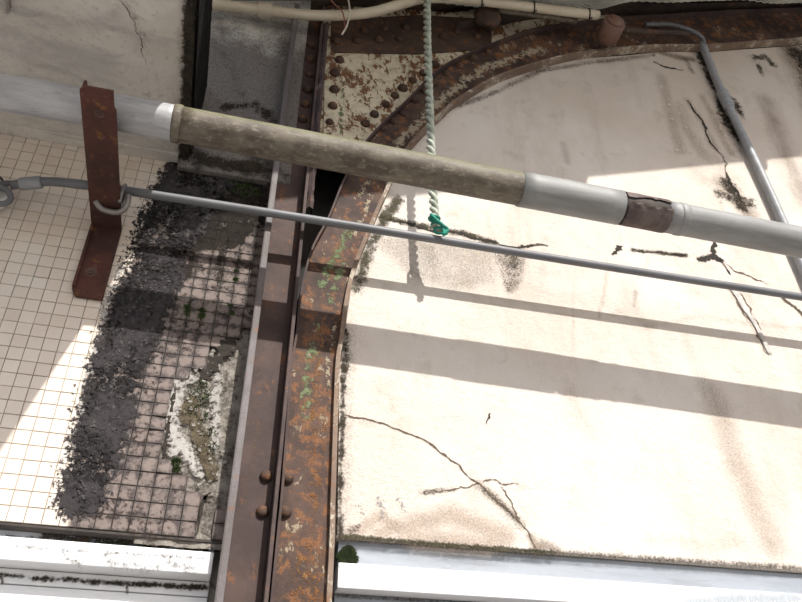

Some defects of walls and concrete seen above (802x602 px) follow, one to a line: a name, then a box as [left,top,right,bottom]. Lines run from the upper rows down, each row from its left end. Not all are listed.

crack [4,0,12,14]
crack [121,1,146,64]
leakage [180,0,213,110]
leakage [220,101,277,122]
crack [687,100,743,204]
leakage [45,143,273,542]
crack [611,242,772,356]
crack [782,298,802,316]
spalling [134,328,251,551]
crack [344,414,536,548]
leakage [0,572,208,593]